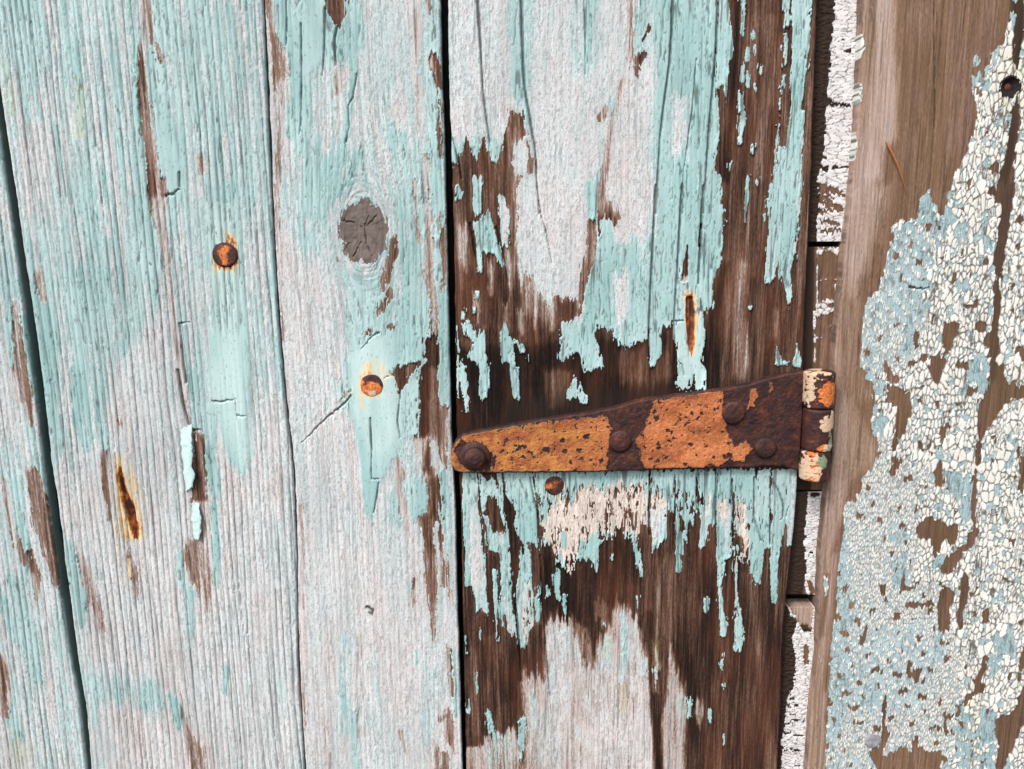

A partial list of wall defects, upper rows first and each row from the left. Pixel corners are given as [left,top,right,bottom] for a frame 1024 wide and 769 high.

peeling [137,0,216,613]
rust [211,229,242,289]
rust [356,355,394,412]
peeling [377,234,400,332]
peeling [391,0,791,769]
rust [682,286,702,358]
peeling [701,0,817,382]
peeling [803,0,1024,769]
rust [112,445,148,583]